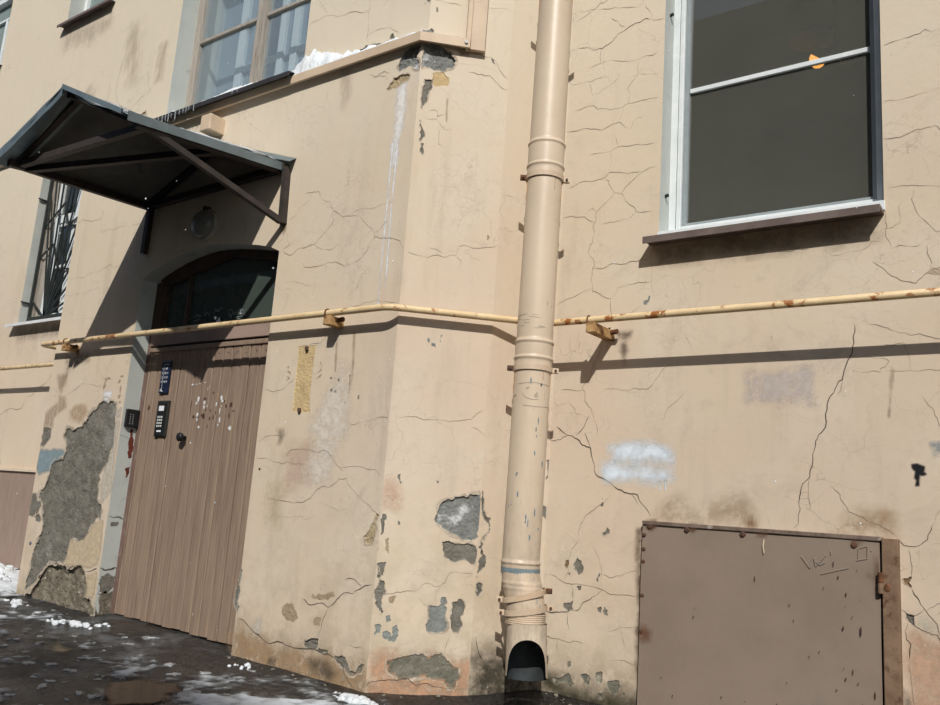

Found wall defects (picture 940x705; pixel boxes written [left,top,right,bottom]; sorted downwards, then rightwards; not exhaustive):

water stain [377,82,407,304]
spalling [386,28,458,154]
crack [560,0,663,311]
spalling [24,375,124,616]
crack [241,572,472,689]
spalling [363,513,400,642]
spalling [384,651,461,691]
spalling [425,597,466,634]
spalling [434,490,491,597]
crack [547,345,649,644]
crack [794,324,940,528]
crack [832,487,940,704]